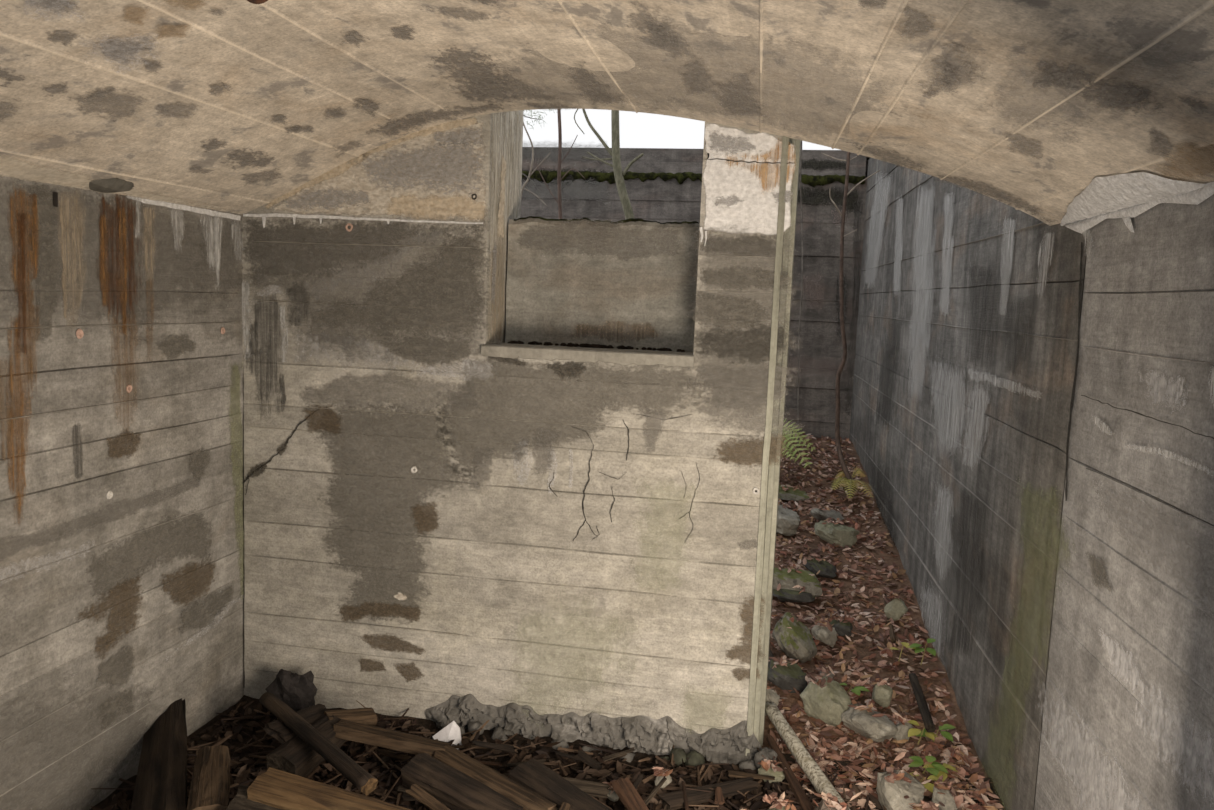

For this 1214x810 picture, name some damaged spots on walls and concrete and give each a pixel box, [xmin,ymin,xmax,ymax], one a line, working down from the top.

leakage [521,142,608,199]
rust [1,190,38,512]
rust [100,196,139,397]
rust [107,423,141,458]
crack [243,355,309,527]
leakage [0,181,795,682]
crack [549,414,692,541]
crack [678,464,700,542]
leakage [79,513,233,729]
crack [240,556,248,688]